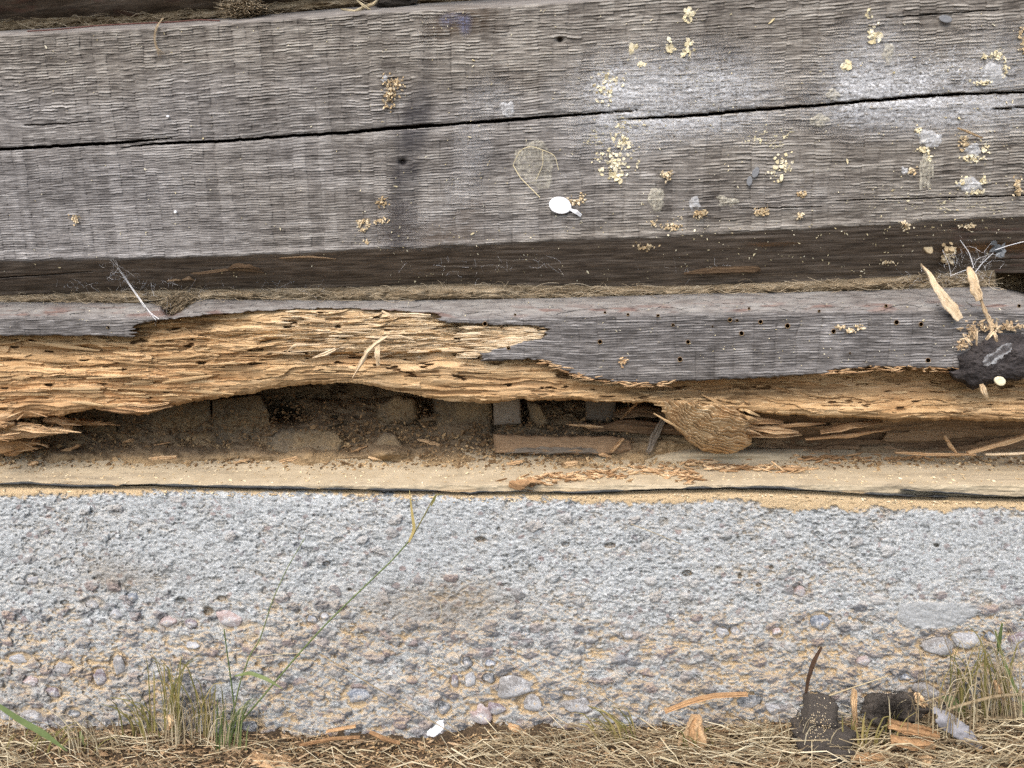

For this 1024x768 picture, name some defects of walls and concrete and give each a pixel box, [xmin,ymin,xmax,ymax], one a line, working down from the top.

crack [0,91,1024,151]
peeling [100,402,173,414]
peeling [746,415,892,440]